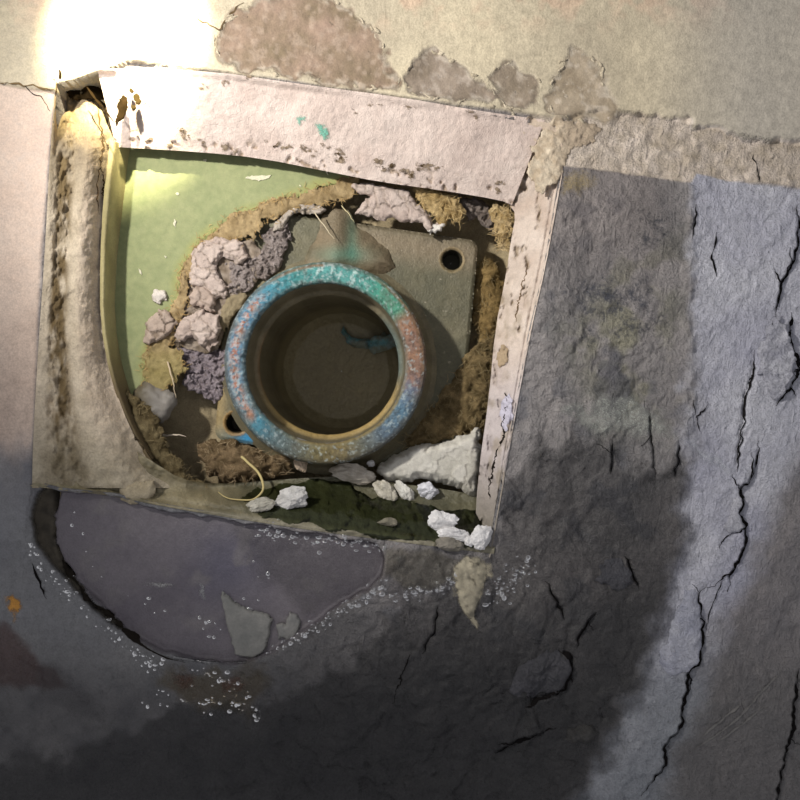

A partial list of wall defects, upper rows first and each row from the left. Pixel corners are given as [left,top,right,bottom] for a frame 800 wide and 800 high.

spalling [213,0,617,123]
spalling [295,158,515,288]
crack [709,232,717,276]
crack [772,206,800,406]
spalling [159,372,222,483]
spalling [250,468,334,482]
spalling [366,463,464,493]
crack [488,393,508,497]
corrosion [8,596,21,615]
spalling [33,488,384,663]
crack [641,350,760,796]
crack [777,670,800,800]